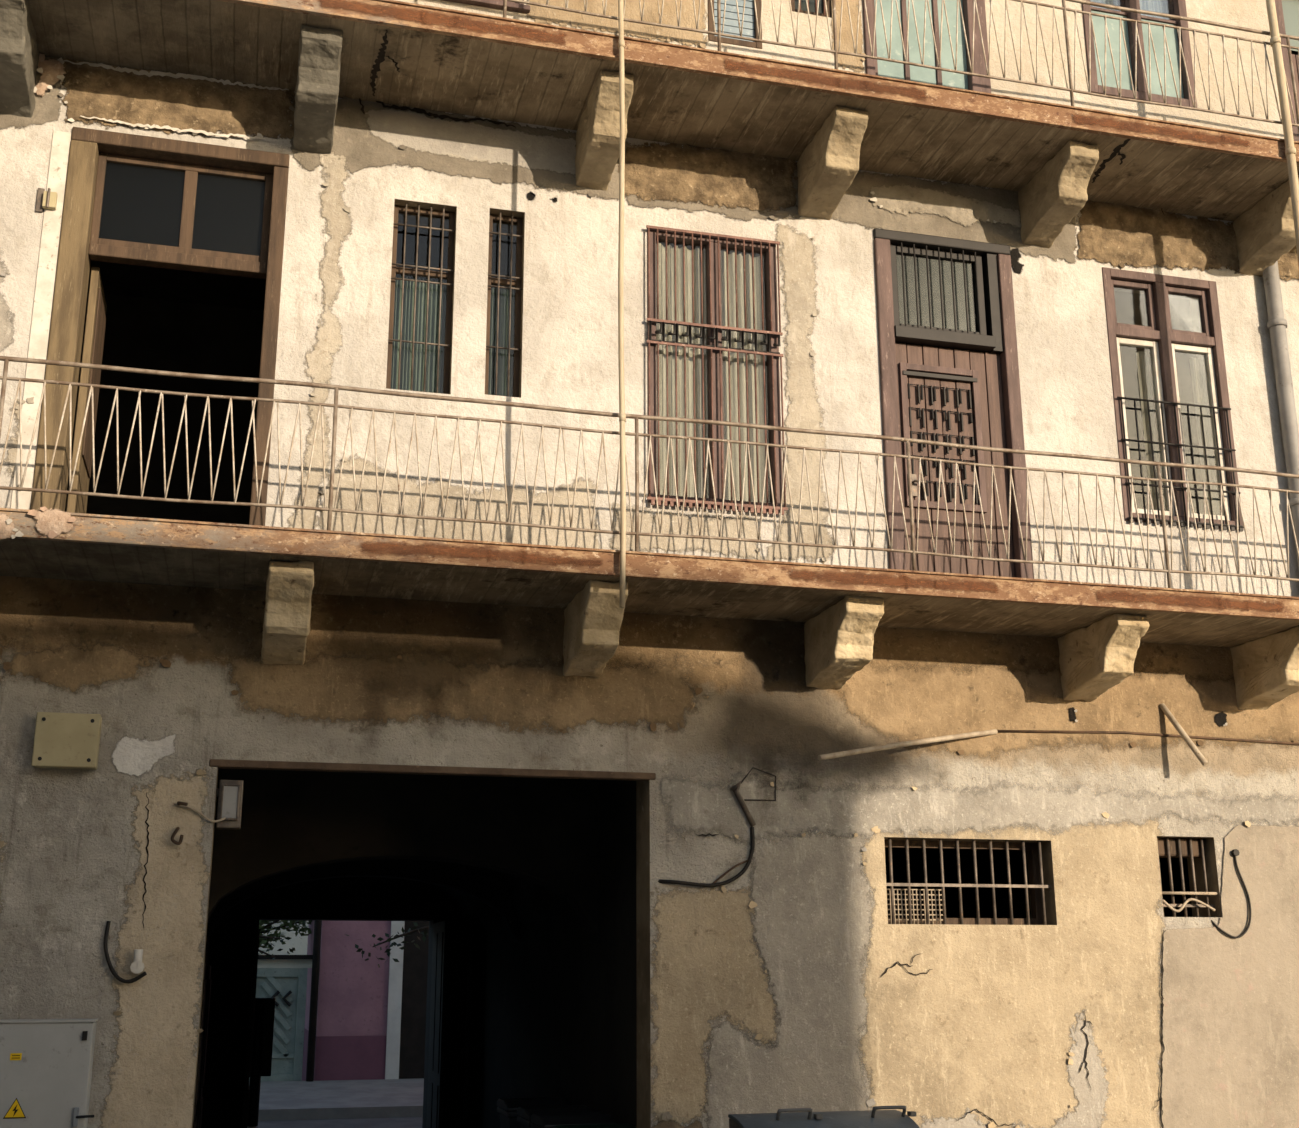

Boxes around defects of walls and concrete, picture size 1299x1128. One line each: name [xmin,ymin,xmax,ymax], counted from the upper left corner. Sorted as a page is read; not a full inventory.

rust [320,0,566,45]
crack [359,30,516,128]
rust [724,59,926,99]
flaking render [618,142,798,213]
crack [1092,139,1131,183]
rust [789,570,998,593]
rust [1096,591,1284,612]
flaking render [0,642,171,694]
crack [880,954,933,978]
flaking render [650,773,1299,1128]
crack [1079,1013,1092,1088]
crack [1153,930,1165,1128]